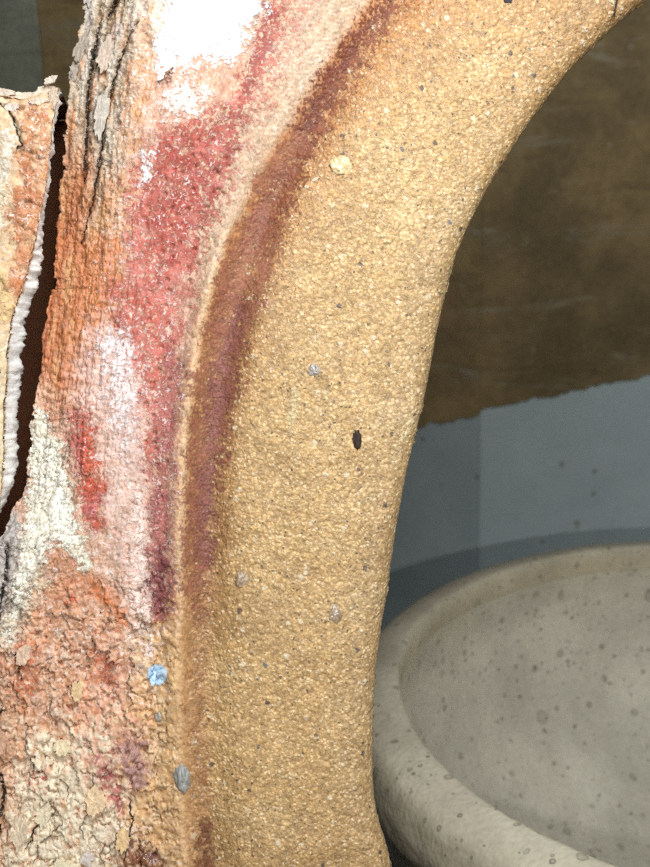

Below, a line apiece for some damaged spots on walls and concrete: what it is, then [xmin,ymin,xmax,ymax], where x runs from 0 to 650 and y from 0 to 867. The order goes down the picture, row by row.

crack [608,0,618,19]
peeling [96,34,115,74]
crack [0,103,23,153]
peeling [93,87,110,141]
peeling [136,149,160,187]
water stain [137,0,412,634]
crack [0,546,8,607]
crack [0,774,8,830]
crack [26,779,134,866]
water stain [92,730,159,819]
water stain [117,833,172,867]
water stain [181,645,224,867]